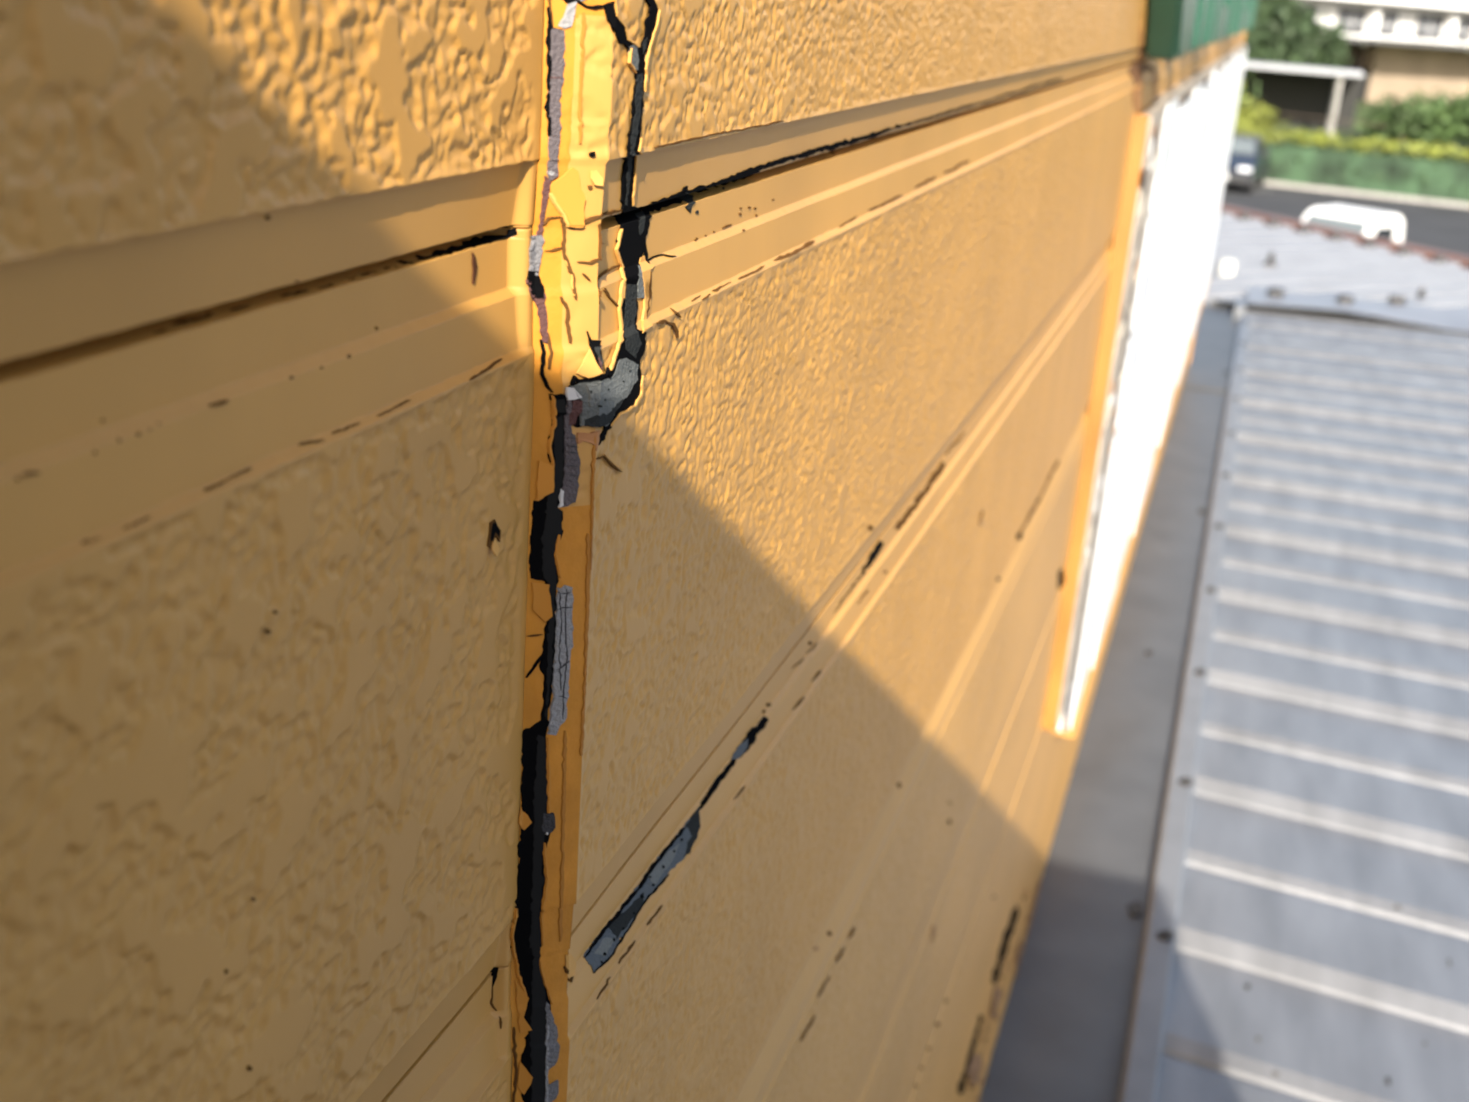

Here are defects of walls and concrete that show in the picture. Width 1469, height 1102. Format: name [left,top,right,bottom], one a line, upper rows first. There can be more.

spalling [536,1,631,508]
crack [395,0,1063,476]
peeling [531,583,553,622]
crack [525,589,572,716]
peeling [731,739,748,759]
peeling [518,808,548,835]
peeling [583,795,711,999]
crack [511,1027,519,1102]